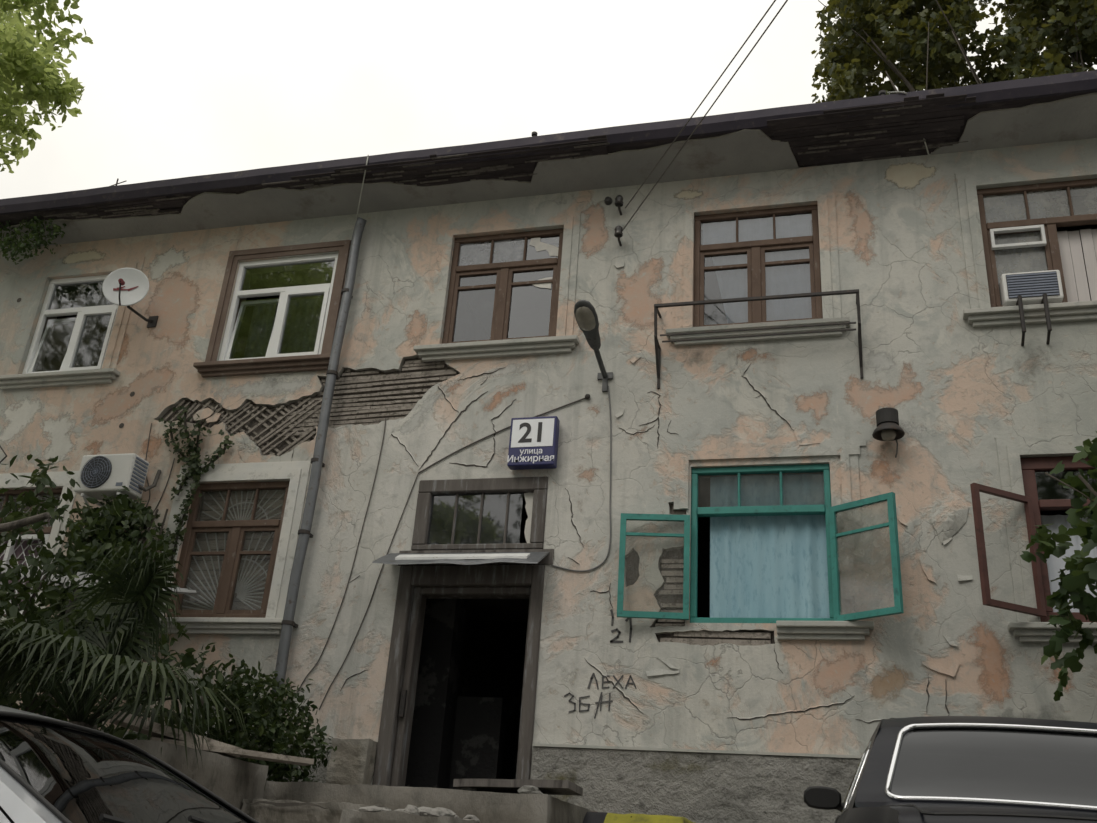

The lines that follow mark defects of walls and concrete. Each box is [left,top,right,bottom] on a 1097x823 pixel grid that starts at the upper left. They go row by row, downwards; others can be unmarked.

peeling [146,248,199,346]
peeling [617,258,663,329]
peeling [0,397,102,463]
flaking render [158,310,460,456]
crack [391,367,516,468]
crack [742,364,793,430]
peeling [845,364,923,420]
crack [565,488,584,564]
crack [585,659,644,714]
crack [729,695,891,724]
crack [926,677,950,716]
peeling [970,623,1010,702]